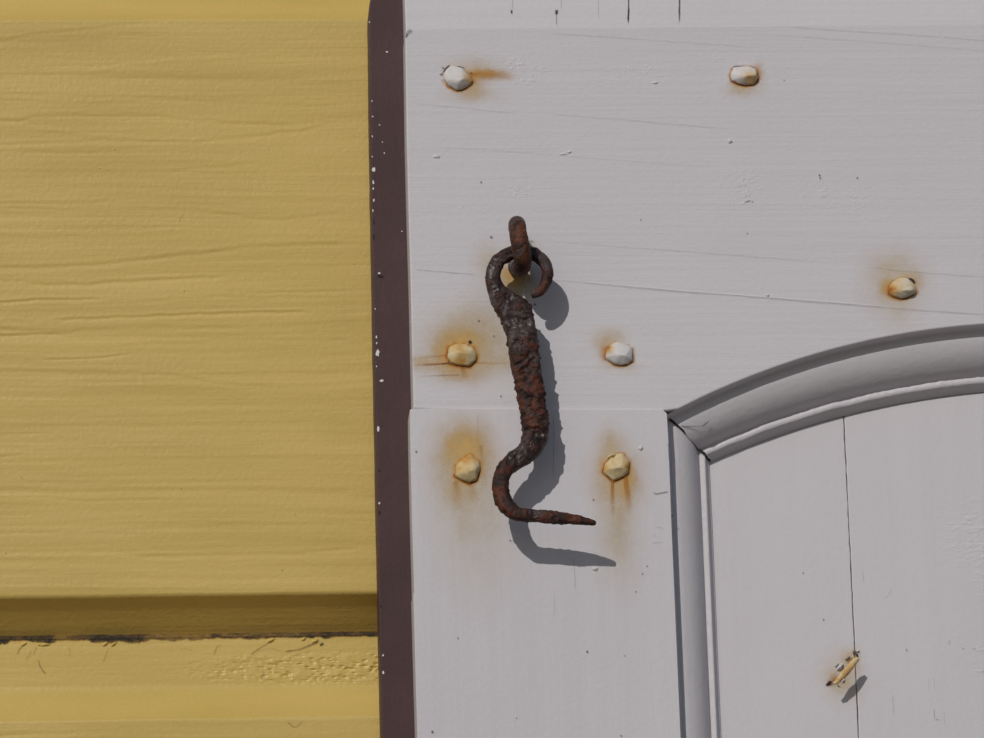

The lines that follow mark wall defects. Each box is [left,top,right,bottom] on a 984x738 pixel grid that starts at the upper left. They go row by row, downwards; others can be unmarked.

corrosion [445,69,499,93]
corrosion [502,269,528,292]
corrosion [882,276,918,301]
corrosion [424,327,487,376]
corrosion [445,430,486,497]
corrosion [600,444,636,499]